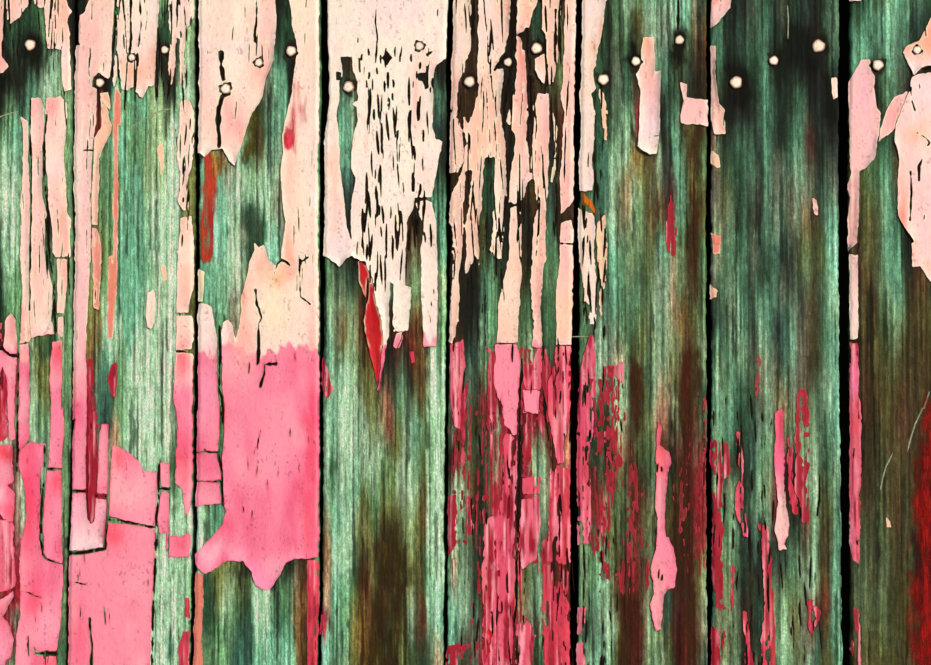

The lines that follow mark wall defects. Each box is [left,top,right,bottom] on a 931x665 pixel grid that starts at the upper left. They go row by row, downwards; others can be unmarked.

peeling [710,0,731,28]
peeling [636,37,661,154]
peeling [680,45,726,134]
peeling [711,151,720,168]
peeling [666,195,677,256]
peeling [711,233,721,254]
peeling [0,0,648,665]
peeling [831,18,931,563]
peeling [645,391,748,631]
peeling [743,388,810,665]
peeling [711,626,726,665]
peeling [850,608,861,665]